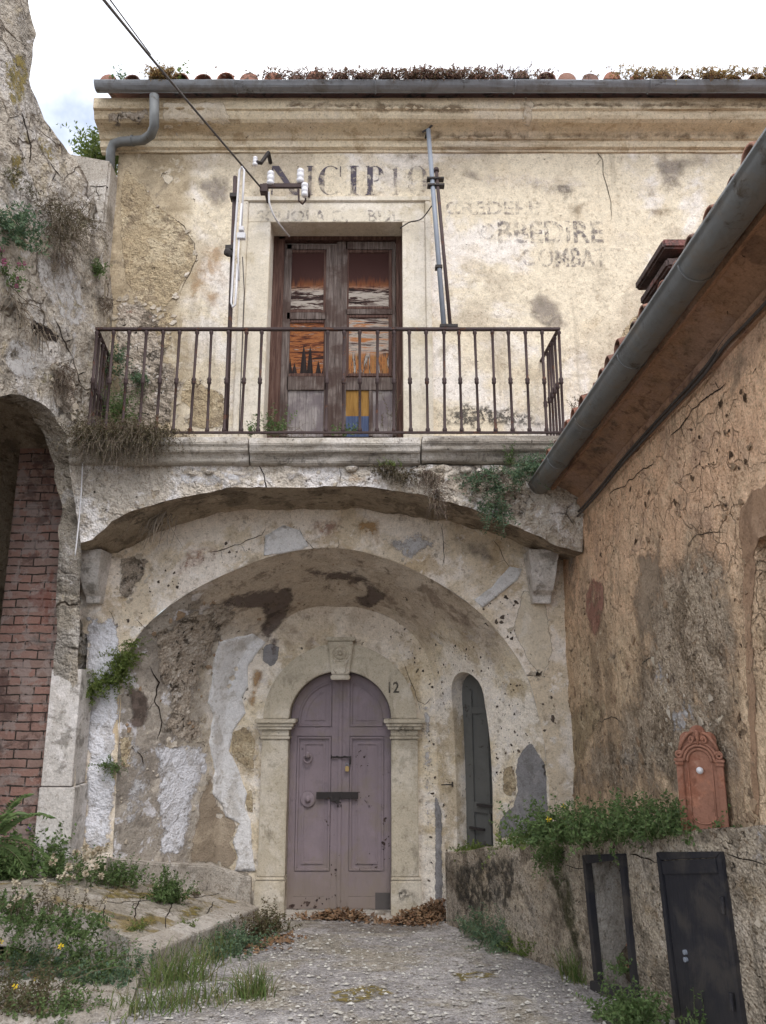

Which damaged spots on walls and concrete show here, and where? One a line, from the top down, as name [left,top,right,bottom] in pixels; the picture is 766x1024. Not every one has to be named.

flaking render [112,171,230,430]
water stain [533,297,561,325]
crack [671,380,726,436]
crack [131,667,166,767]
flaking render [84,550,266,875]
water stain [456,859,520,916]